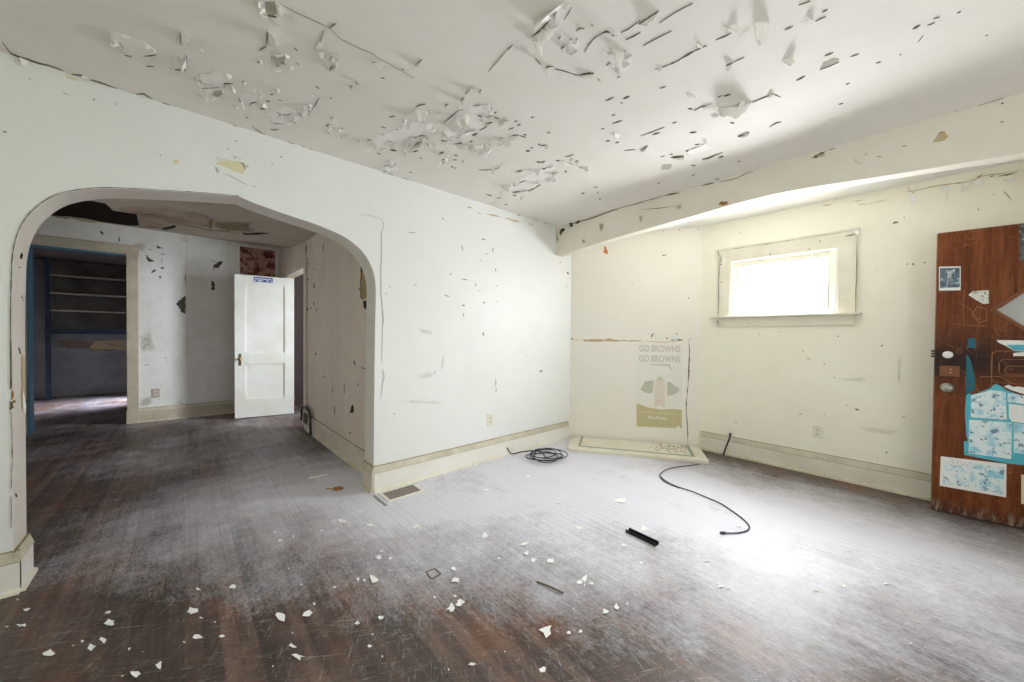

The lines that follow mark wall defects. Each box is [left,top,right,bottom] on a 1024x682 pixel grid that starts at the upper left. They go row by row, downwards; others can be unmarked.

peeling [531,1,600,81]
peeling [603,3,693,78]
spalling [820,52,859,70]
peeling [170,54,332,150]
spalling [602,96,676,152]
peeling [687,93,780,138]
peeling [215,140,255,187]
peeling [358,88,588,225]
peeling [662,132,724,178]
peeling [906,169,1024,204]
peeling [58,340,125,351]
crack [571,338,694,439]